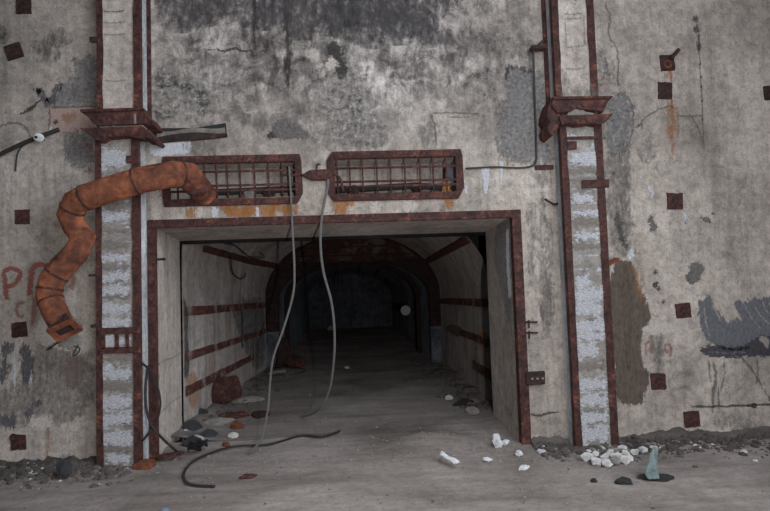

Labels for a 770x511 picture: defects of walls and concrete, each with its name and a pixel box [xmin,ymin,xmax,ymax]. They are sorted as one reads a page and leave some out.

damp [282,0,293,87]
rust [187,204,297,218]
rust [369,201,384,214]
rust [400,200,418,213]
damp [610,260,662,405]
damp [0,356,93,430]